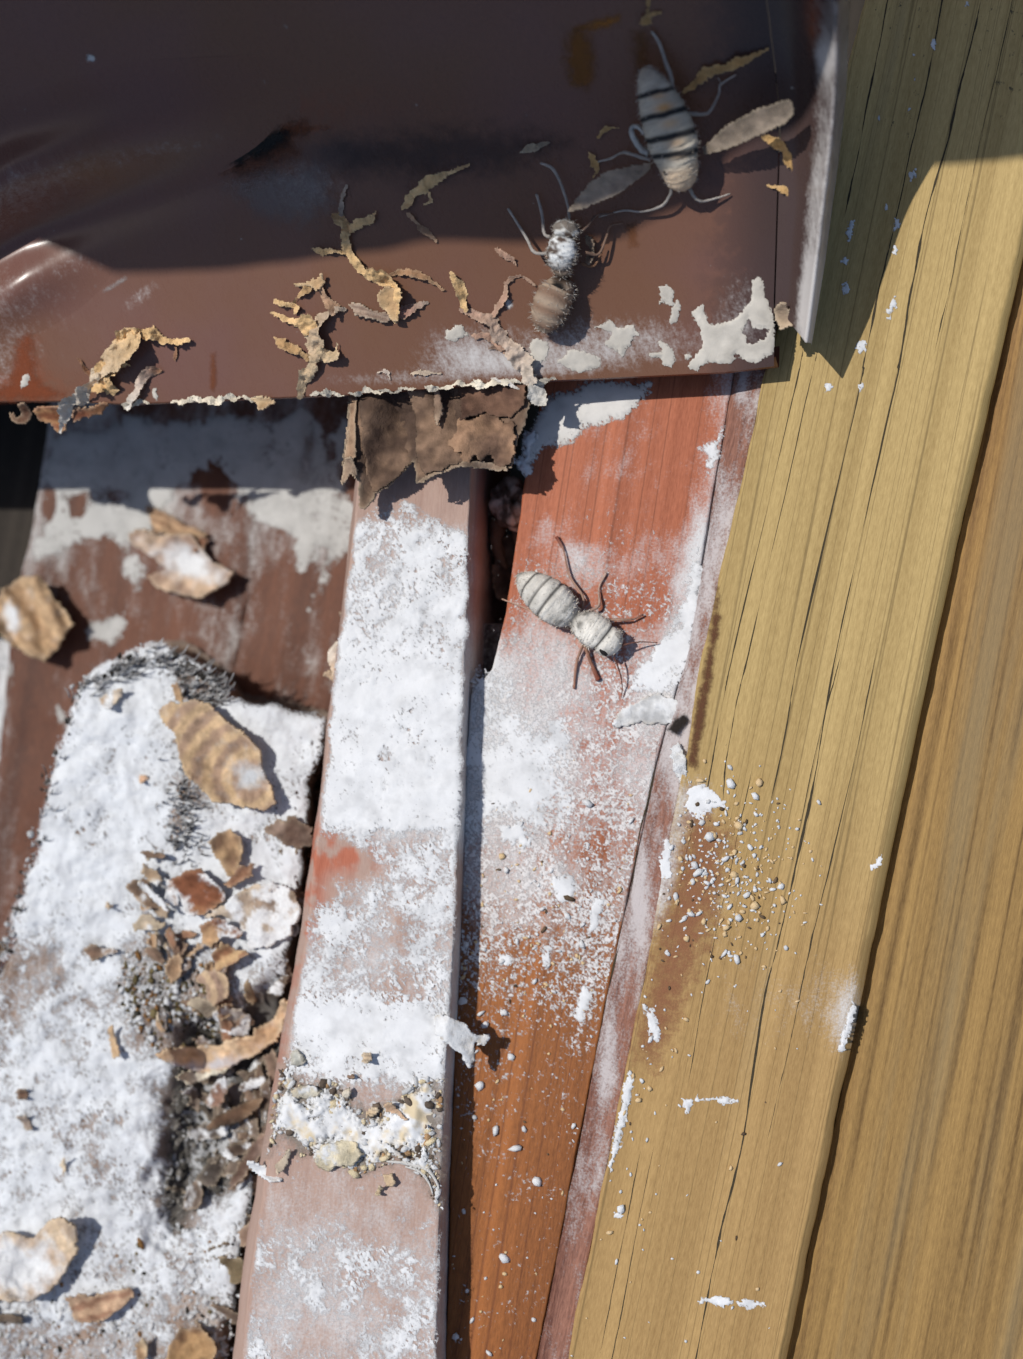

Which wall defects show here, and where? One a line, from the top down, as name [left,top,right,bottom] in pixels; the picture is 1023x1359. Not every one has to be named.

corrosion [231,127,307,176]
corrosion [0,337,56,401]
peeling [445,324,468,342]
peeling [529,319,639,373]
peeling [649,277,775,372]
peeling [251,395,276,411]
water stain [116,943,220,1050]